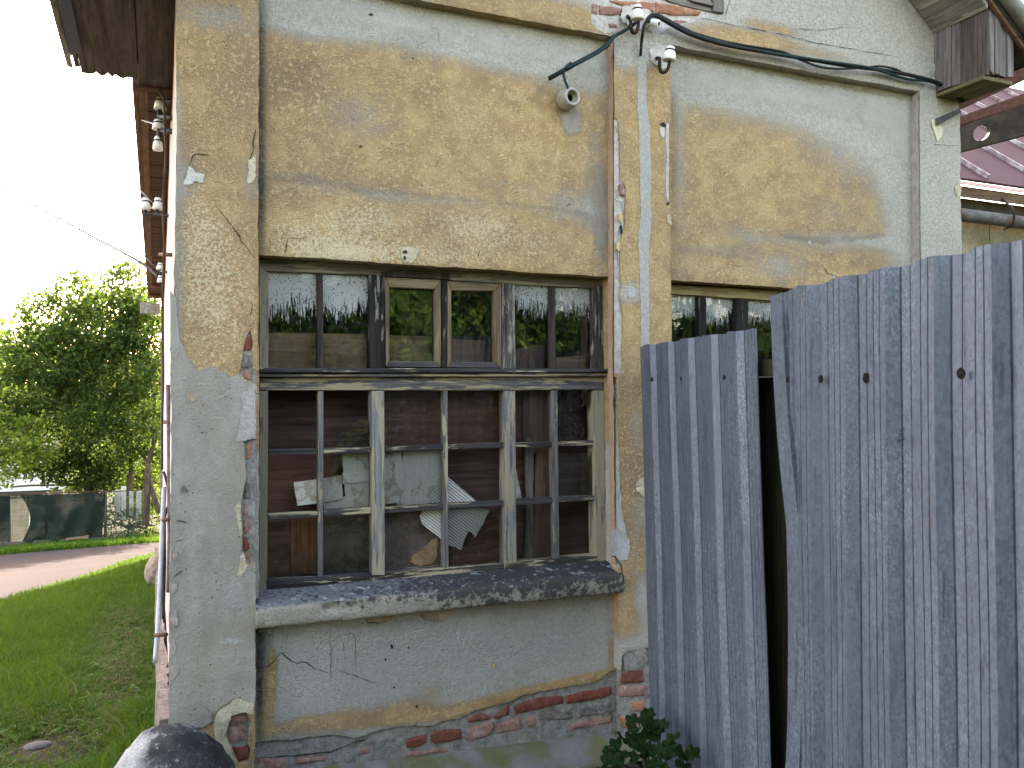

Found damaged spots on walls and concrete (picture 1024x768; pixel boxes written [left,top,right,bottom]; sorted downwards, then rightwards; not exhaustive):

flaking render [591,0,729,69]
flaking render [183,166,205,185]
flaking render [247,156,256,184]
flaking render [239,331,257,383]
flaking render [611,119,636,568]
flaking render [235,439,255,576]
crack [264,652,374,683]
flaking render [213,648,650,768]